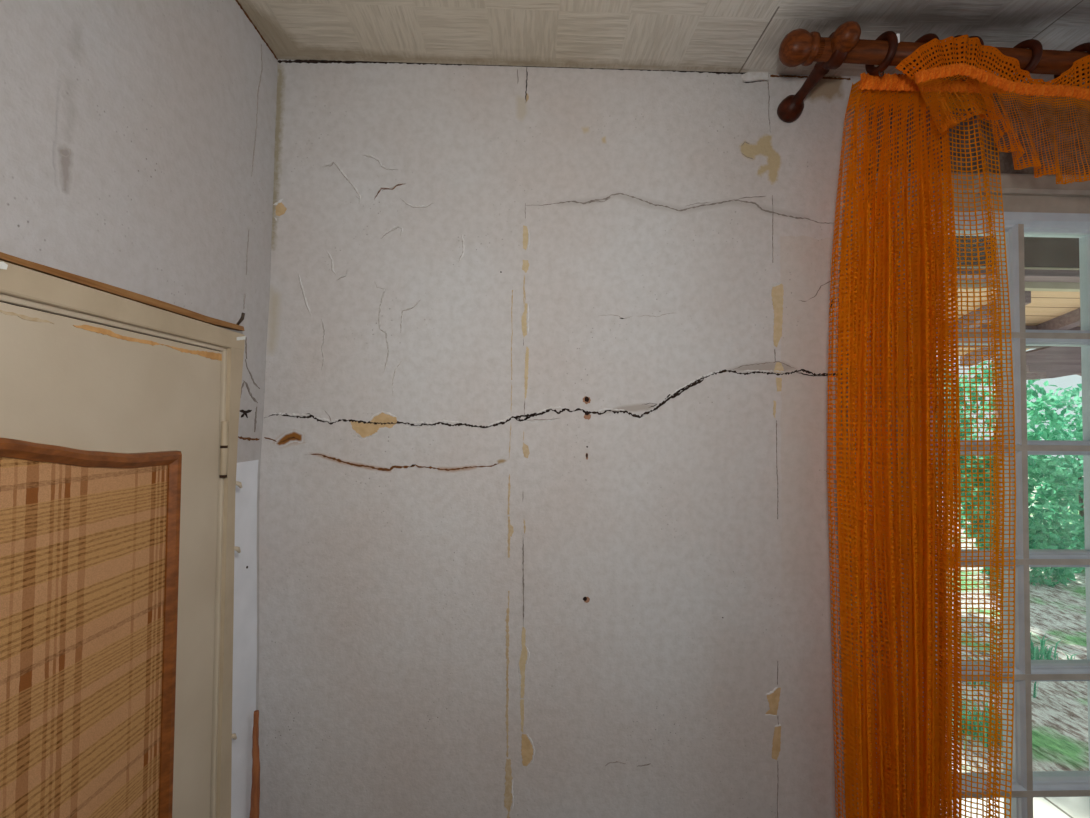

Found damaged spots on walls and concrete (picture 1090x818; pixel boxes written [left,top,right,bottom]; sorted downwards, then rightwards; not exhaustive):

peeling [737,132,784,187]
crack [526,189,830,224]
peeling [521,303,529,398]
crack [240,337,848,432]
peeling [351,411,397,439]
crack [307,451,508,474]
peeling [504,627,535,818]
peeling [765,687,781,760]